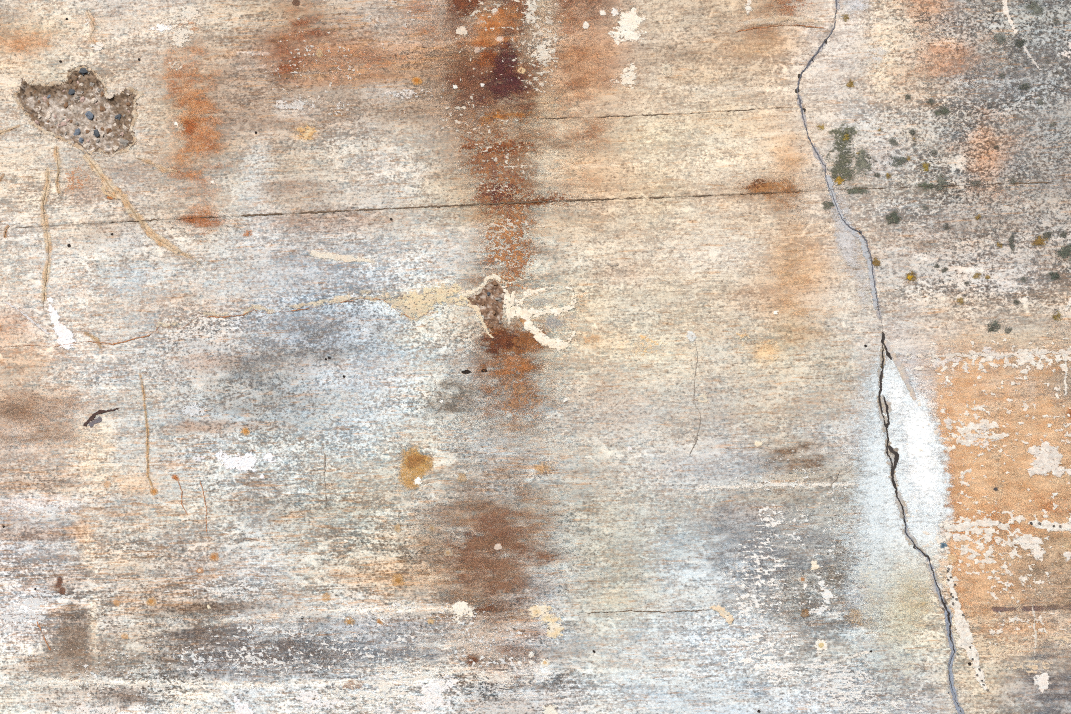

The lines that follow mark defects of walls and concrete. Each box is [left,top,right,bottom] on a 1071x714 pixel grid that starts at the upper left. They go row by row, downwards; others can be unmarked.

spalling [11,66,144,156]
corrosion [166,49,221,183]
corrosion [448,0,572,289]
corrosion [183,207,220,227]
leakage [832,188,869,302]
peeling [383,274,576,351]
corrosion [478,328,549,418]
crack [737,0,964,714]
corrosion [401,448,432,487]
corrosion [445,508,553,614]